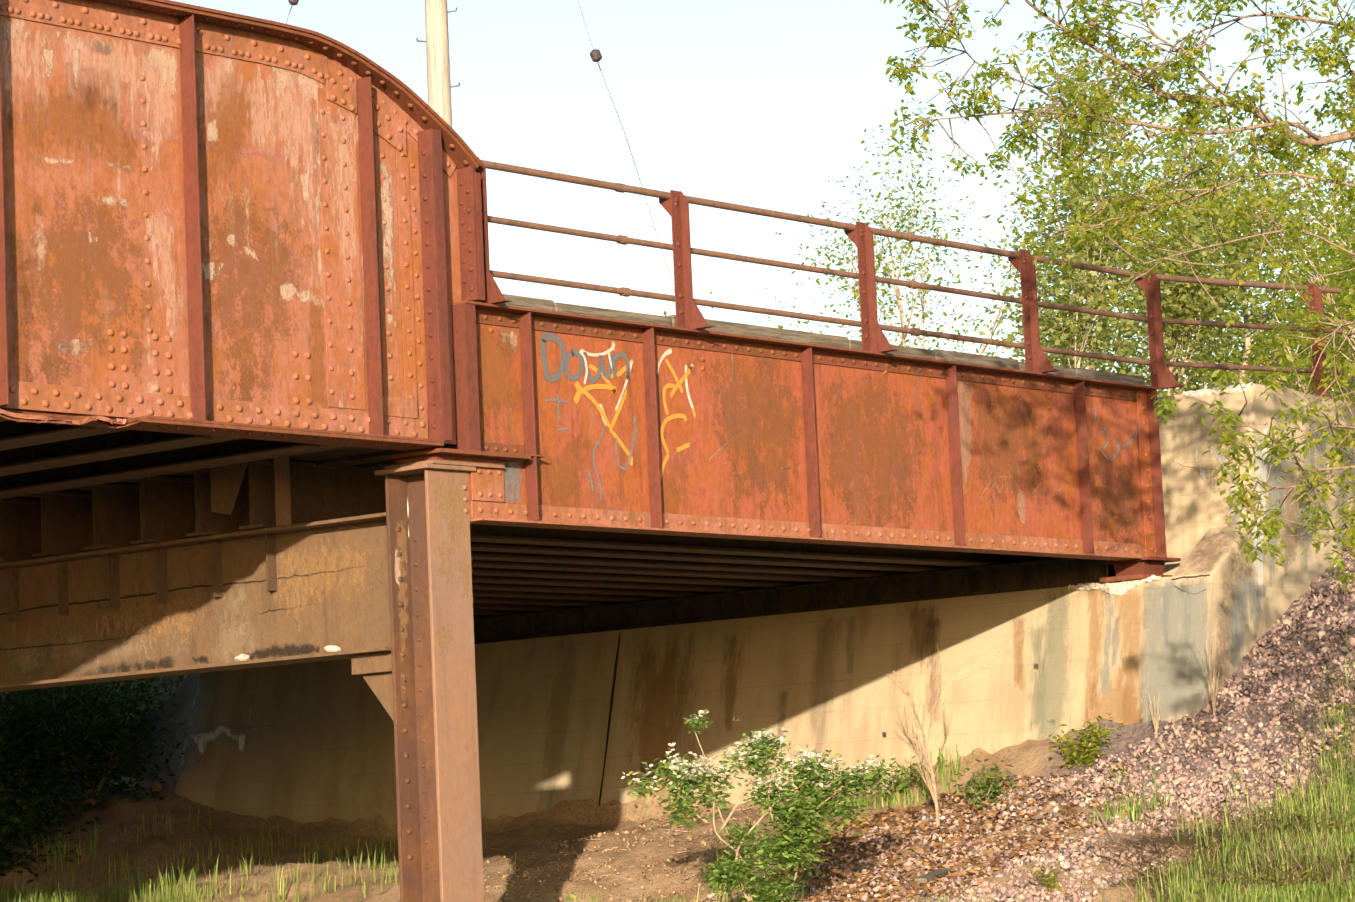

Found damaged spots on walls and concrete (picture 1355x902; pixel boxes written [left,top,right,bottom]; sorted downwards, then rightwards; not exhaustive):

peeling [2,18,177,166]
corrosion [214,83,248,164]
corrosion [11,240,31,382]
peeling [57,339,92,356]
peeling [91,194,128,208]
peeling [147,214,180,335]
peeling [200,58,358,309]
corrosion [311,305,323,402]
peeling [380,162,395,284]
corrosion [477,331,515,440]
corrosion [503,460,521,503]
leakage [178,697,253,771]